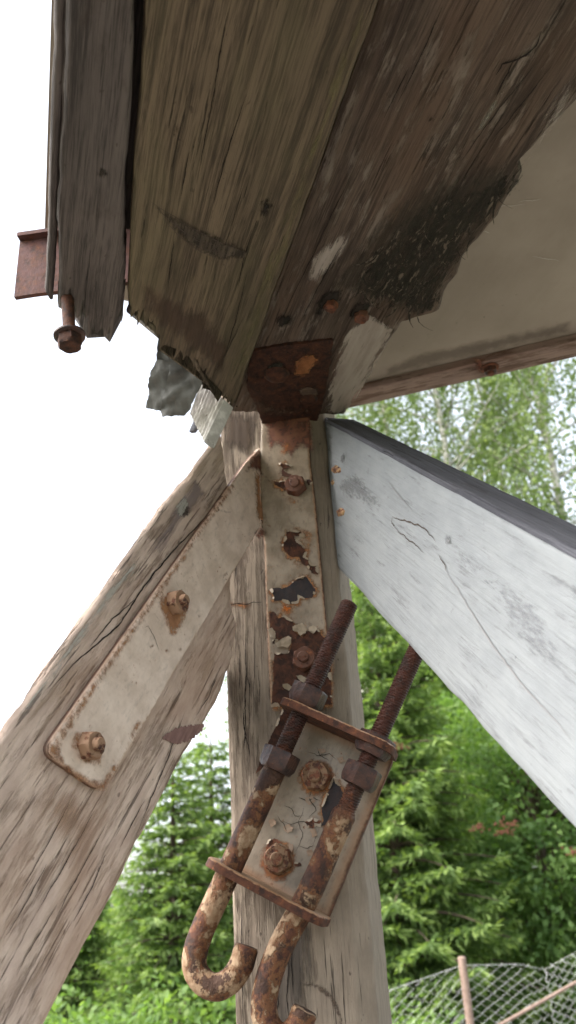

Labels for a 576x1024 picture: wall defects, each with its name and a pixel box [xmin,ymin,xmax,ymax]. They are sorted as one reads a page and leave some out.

corrosion [266,417,312,455]
corrosion [295,355,318,397]
corrosion [50,629,135,790]
crack [52,522,201,688]
crack [8,602,260,972]
peeling [267,530,325,746]
crack [269,748,345,856]
peeling [320,664,334,707]
crack [389,483,570,738]